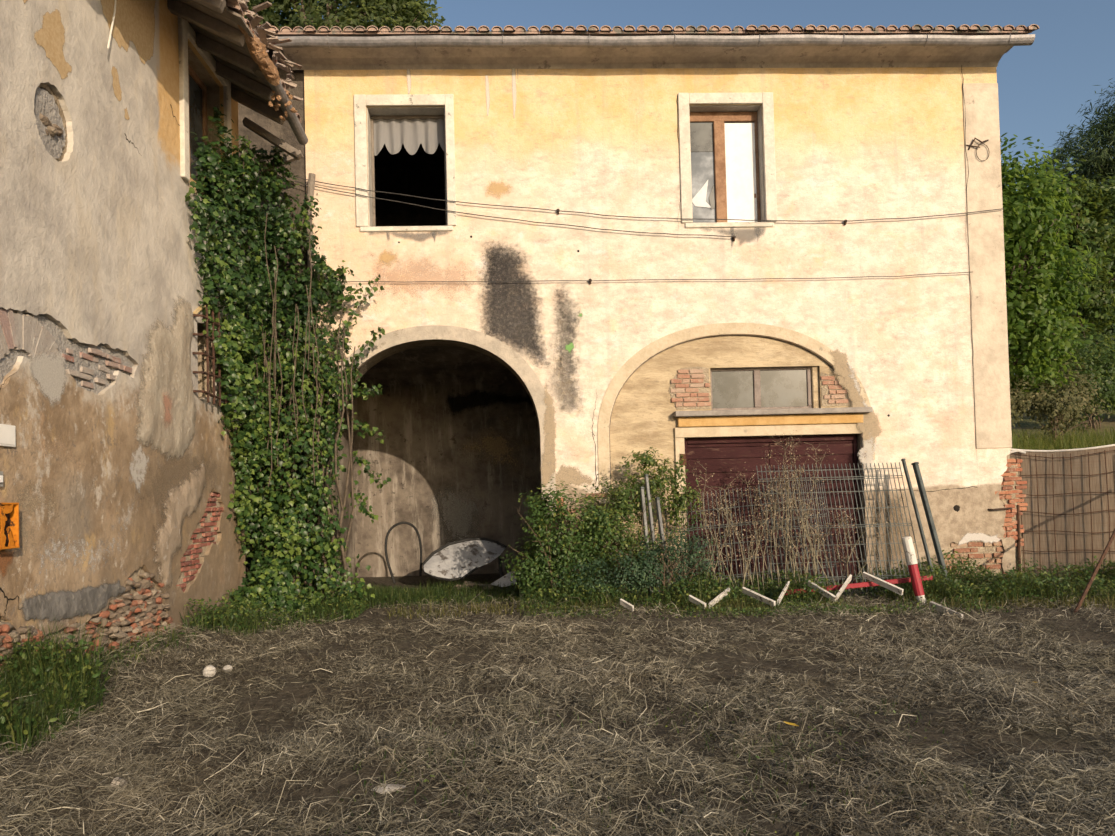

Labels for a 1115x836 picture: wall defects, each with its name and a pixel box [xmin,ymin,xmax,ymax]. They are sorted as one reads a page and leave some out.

peeling [34,9,72,79]
peeling [101,0,156,64]
spalling [0,308,134,395]
water stain [482,245,549,365]
spalling [176,491,224,592]
spalling [941,454,1018,578]